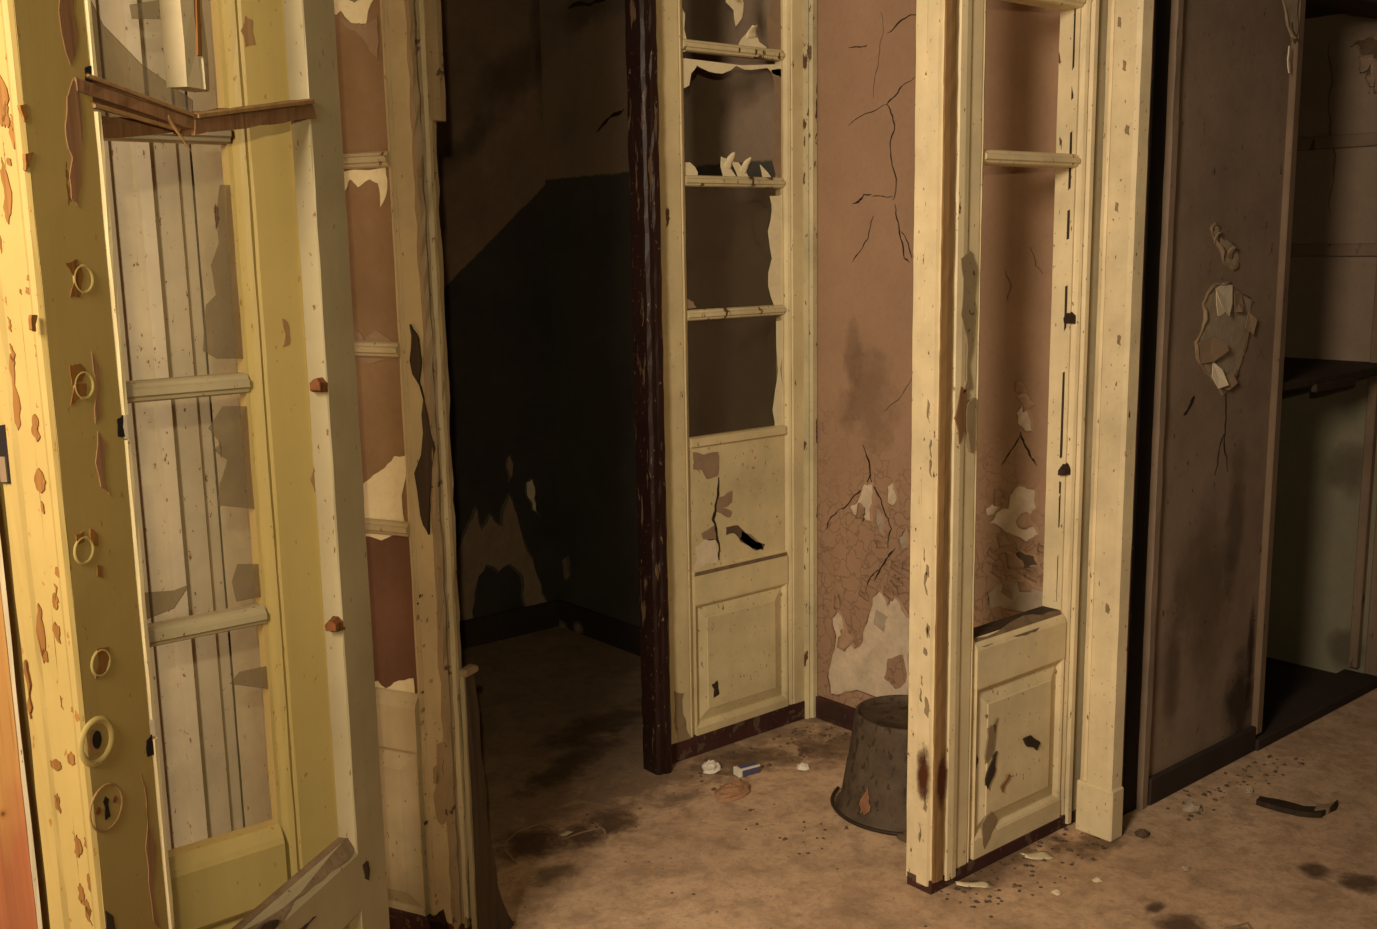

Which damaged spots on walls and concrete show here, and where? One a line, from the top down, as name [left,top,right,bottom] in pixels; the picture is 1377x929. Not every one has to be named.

crack [848,13,916,263]
peeling [1194,222,1257,397]
peeling [456,455,548,621]
crack [826,446,895,585]
peeling [827,481,910,697]
peeling [985,484,1044,613]
crack [1001,432,1037,466]